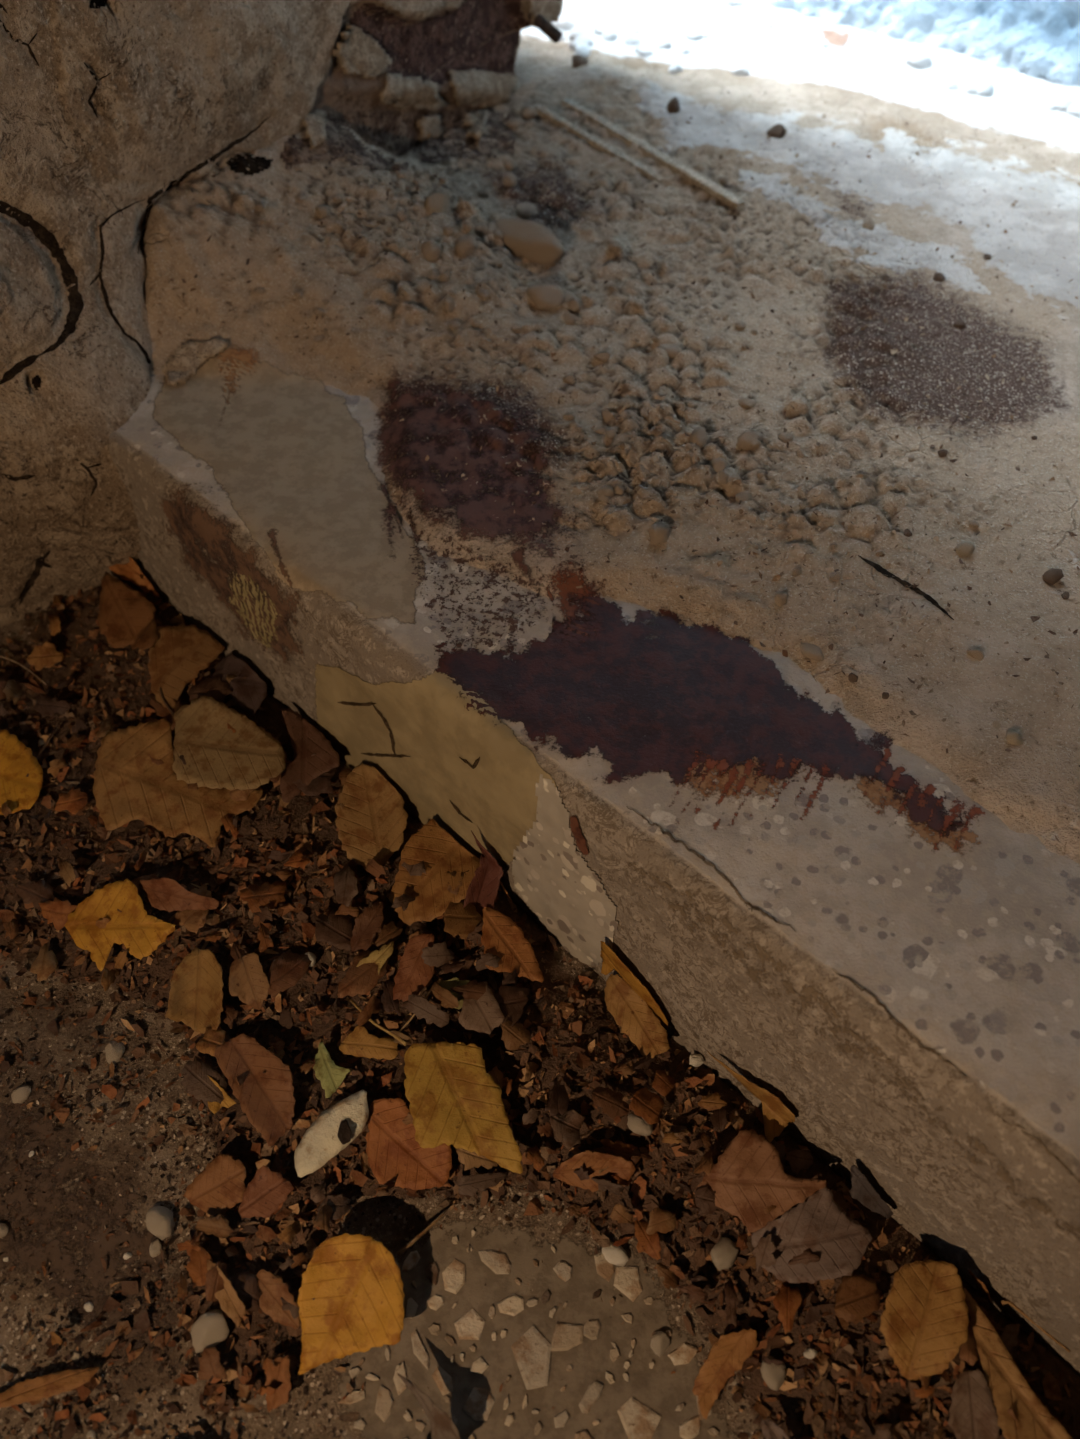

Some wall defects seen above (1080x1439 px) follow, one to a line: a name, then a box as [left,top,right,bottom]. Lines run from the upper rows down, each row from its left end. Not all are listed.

crack [0,4,39,66]
crack [84,63,111,117]
spalling [280,0,561,172]
crack [0,115,271,384]
crack [2,473,35,481]
crack [75,459,101,497]
damp [160,483,305,678]
corrosion [536,555,615,643]
crack [858,555,954,620]